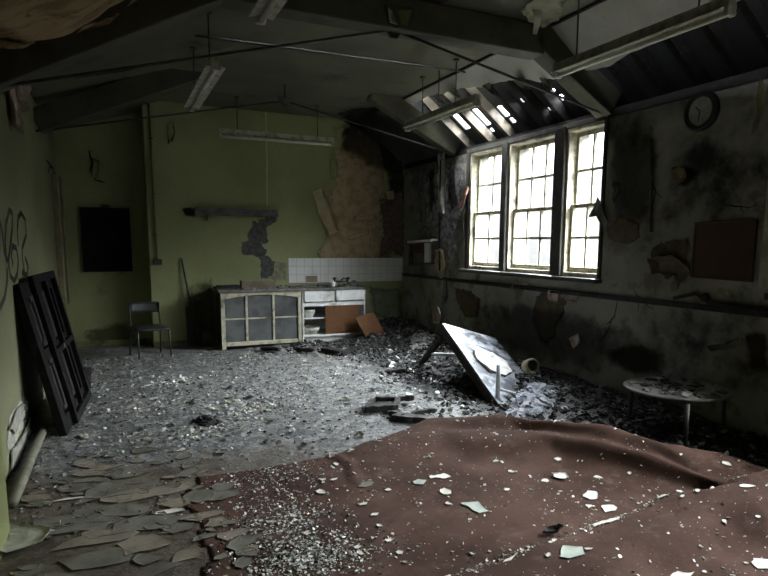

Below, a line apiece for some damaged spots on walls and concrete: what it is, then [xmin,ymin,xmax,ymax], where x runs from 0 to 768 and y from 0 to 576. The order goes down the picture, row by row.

flaking render [242,217,287,280]
peeling [313,123,394,258]
flaking render [416,153,480,324]
peeling [588,197,607,231]
flaking render [647,239,690,292]